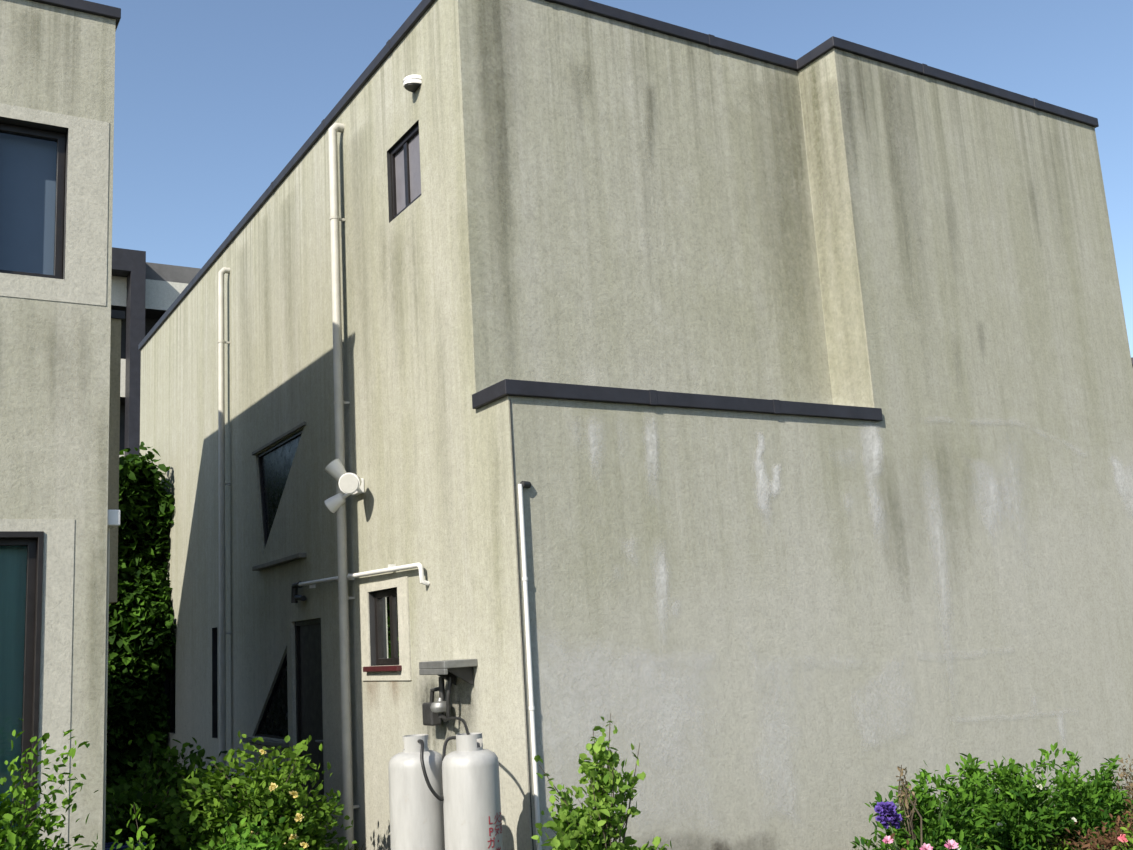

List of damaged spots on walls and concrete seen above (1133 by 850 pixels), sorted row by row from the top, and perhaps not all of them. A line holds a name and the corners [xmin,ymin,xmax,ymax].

damp [646,426,656,469]